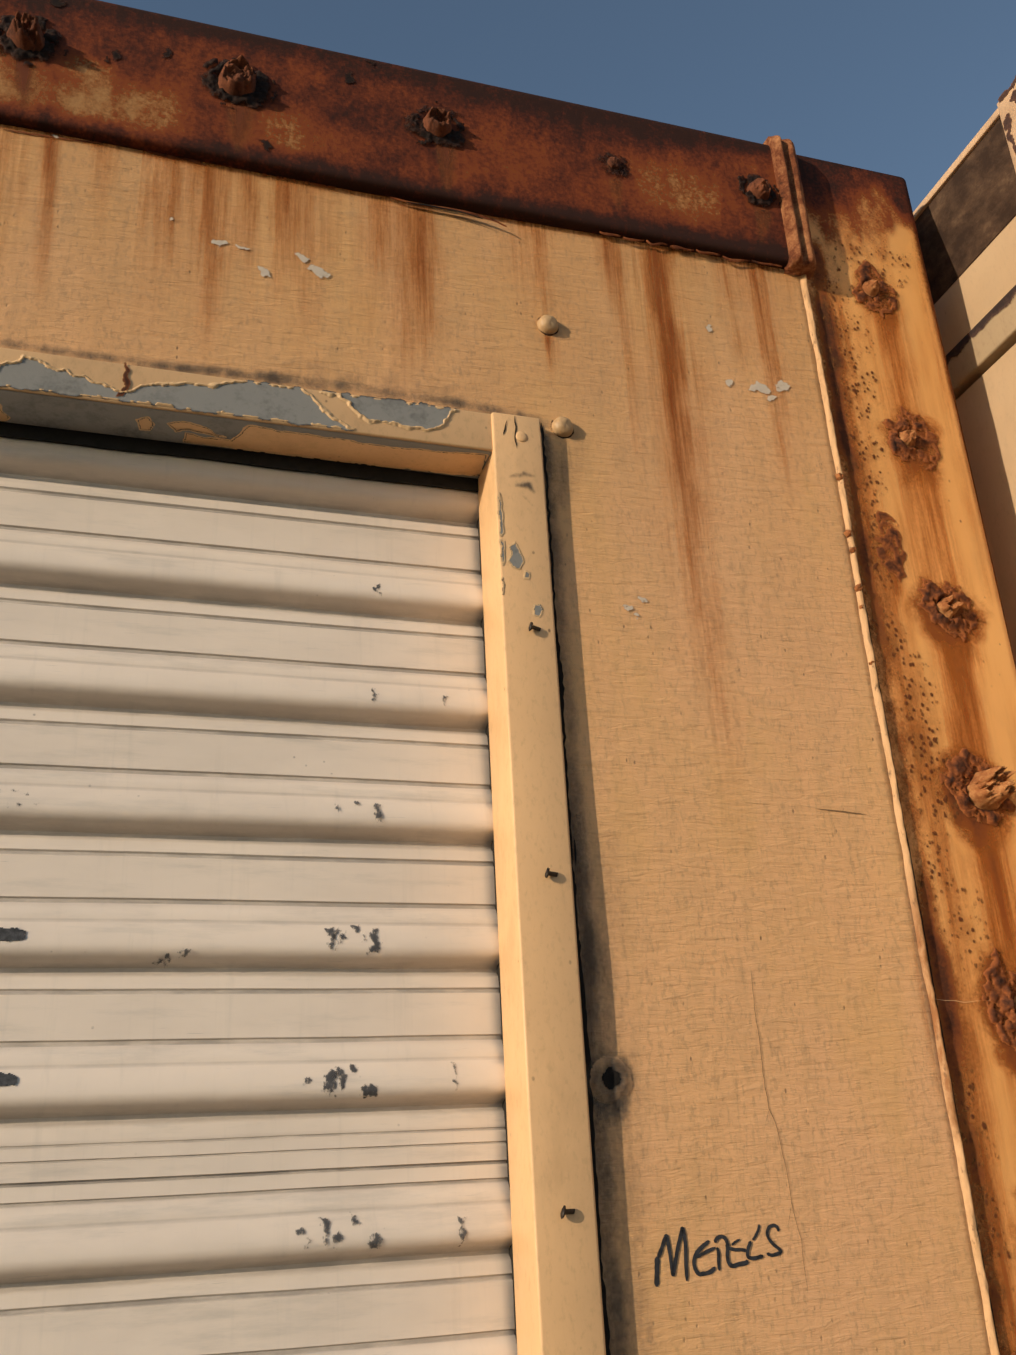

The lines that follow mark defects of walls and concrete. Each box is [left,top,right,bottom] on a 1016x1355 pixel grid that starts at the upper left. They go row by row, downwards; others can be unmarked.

peeling [211,239,250,250]
peeling [295,252,330,278]
rust [0,0,789,496]
peeling [0,354,491,479]
peeling [748,380,790,402]
peeling [497,492,531,595]
peeling [532,604,544,618]
rust [797,155,1016,1355]